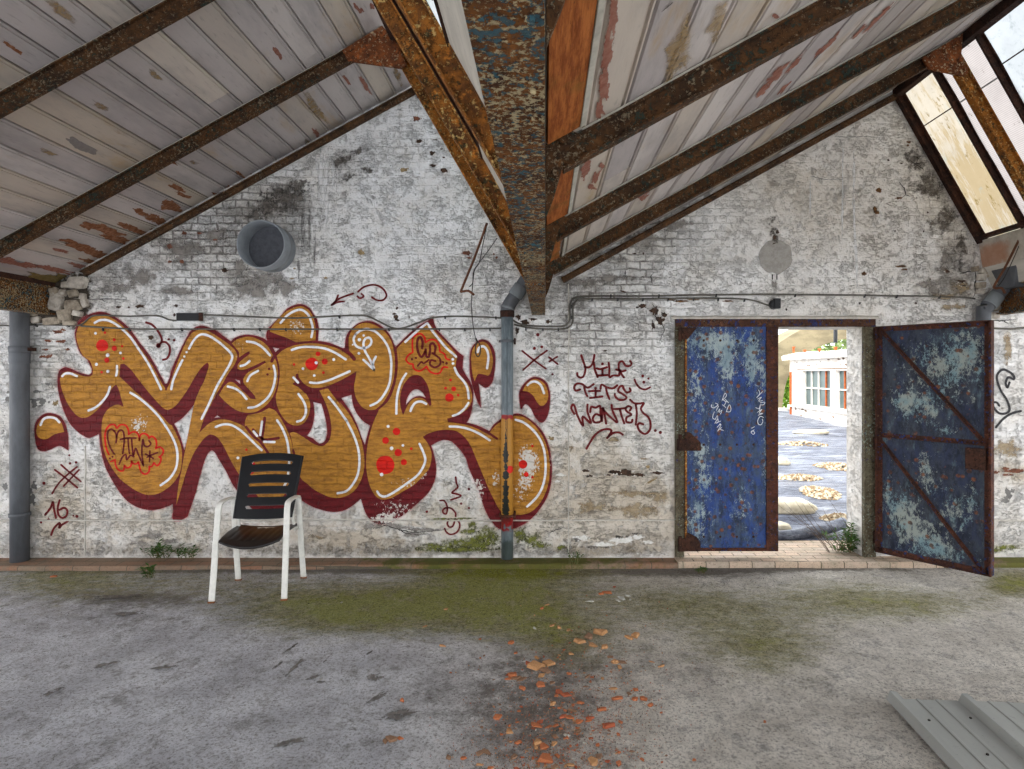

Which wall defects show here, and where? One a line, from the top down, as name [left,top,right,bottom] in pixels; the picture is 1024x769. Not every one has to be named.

peeling [596,0,618,119]
leakage [244,147,372,263]
spalling [0,184,192,359]
spalling [581,458,663,484]